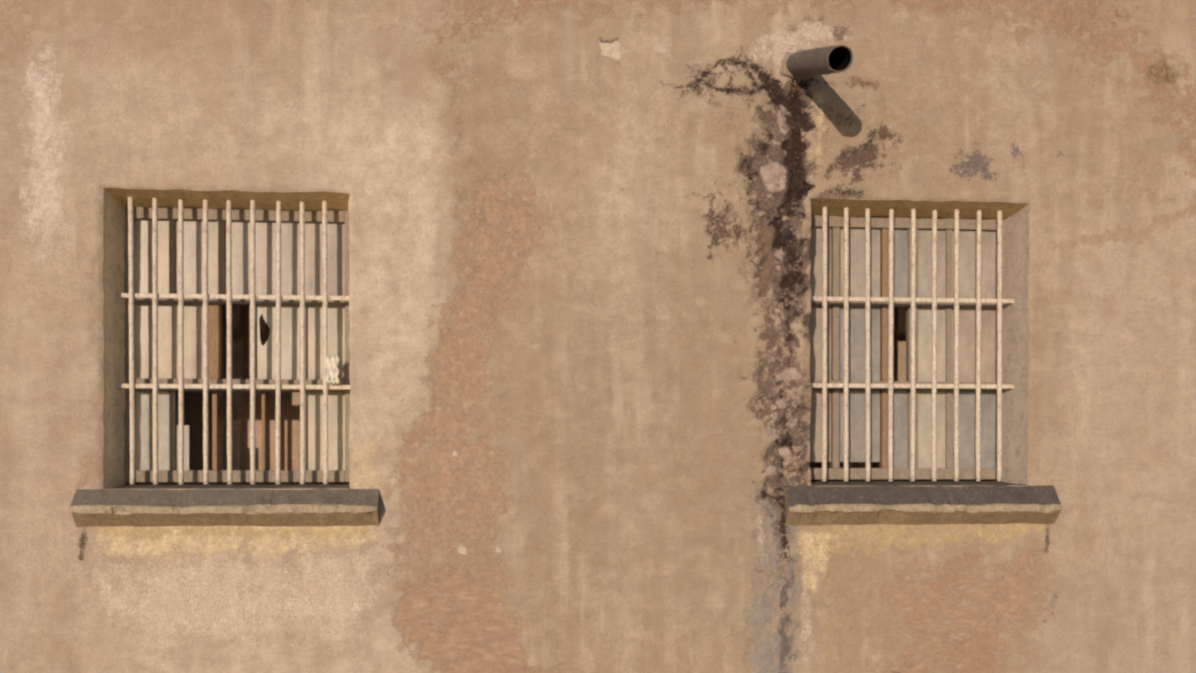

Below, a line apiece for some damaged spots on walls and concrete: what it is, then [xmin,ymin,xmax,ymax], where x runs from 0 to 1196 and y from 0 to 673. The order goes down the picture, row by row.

damp [404,0,857,217]
damp [692,180,752,263]
damp [808,92,931,200]
damp [891,0,1196,254]